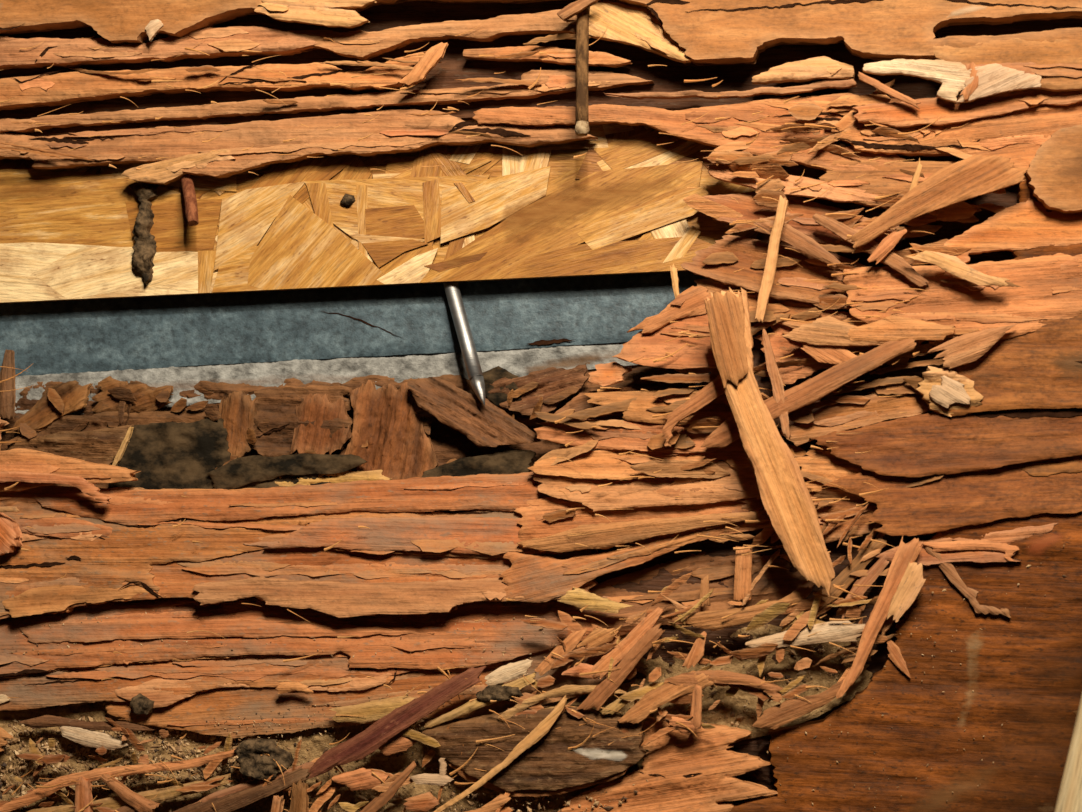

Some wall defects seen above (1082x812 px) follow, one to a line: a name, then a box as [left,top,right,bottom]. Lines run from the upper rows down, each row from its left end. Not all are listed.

crack [642,0,871,21]
crack [949,0,1077,9]
peeling [0,0,1082,566]
crack [964,408,1082,418]
peeling [0,164,815,738]